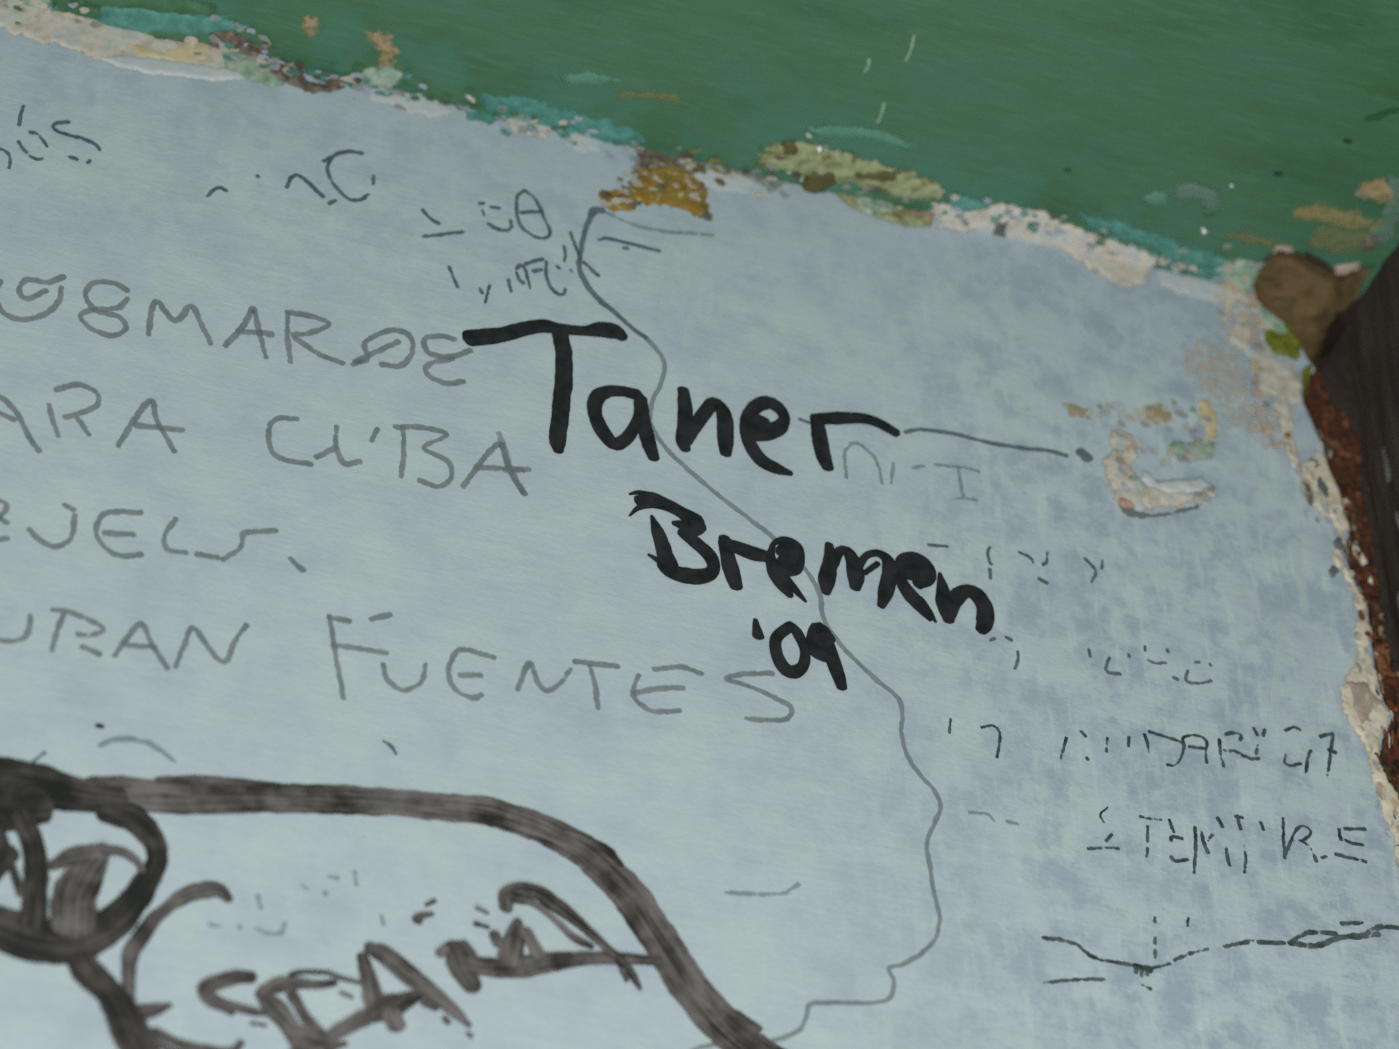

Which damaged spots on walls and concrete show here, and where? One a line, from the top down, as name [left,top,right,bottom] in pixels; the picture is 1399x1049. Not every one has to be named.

peeling [0,0,660,161]
rust [599,149,713,221]
peeling [660,133,1399,866]
rust [1302,317,1399,798]